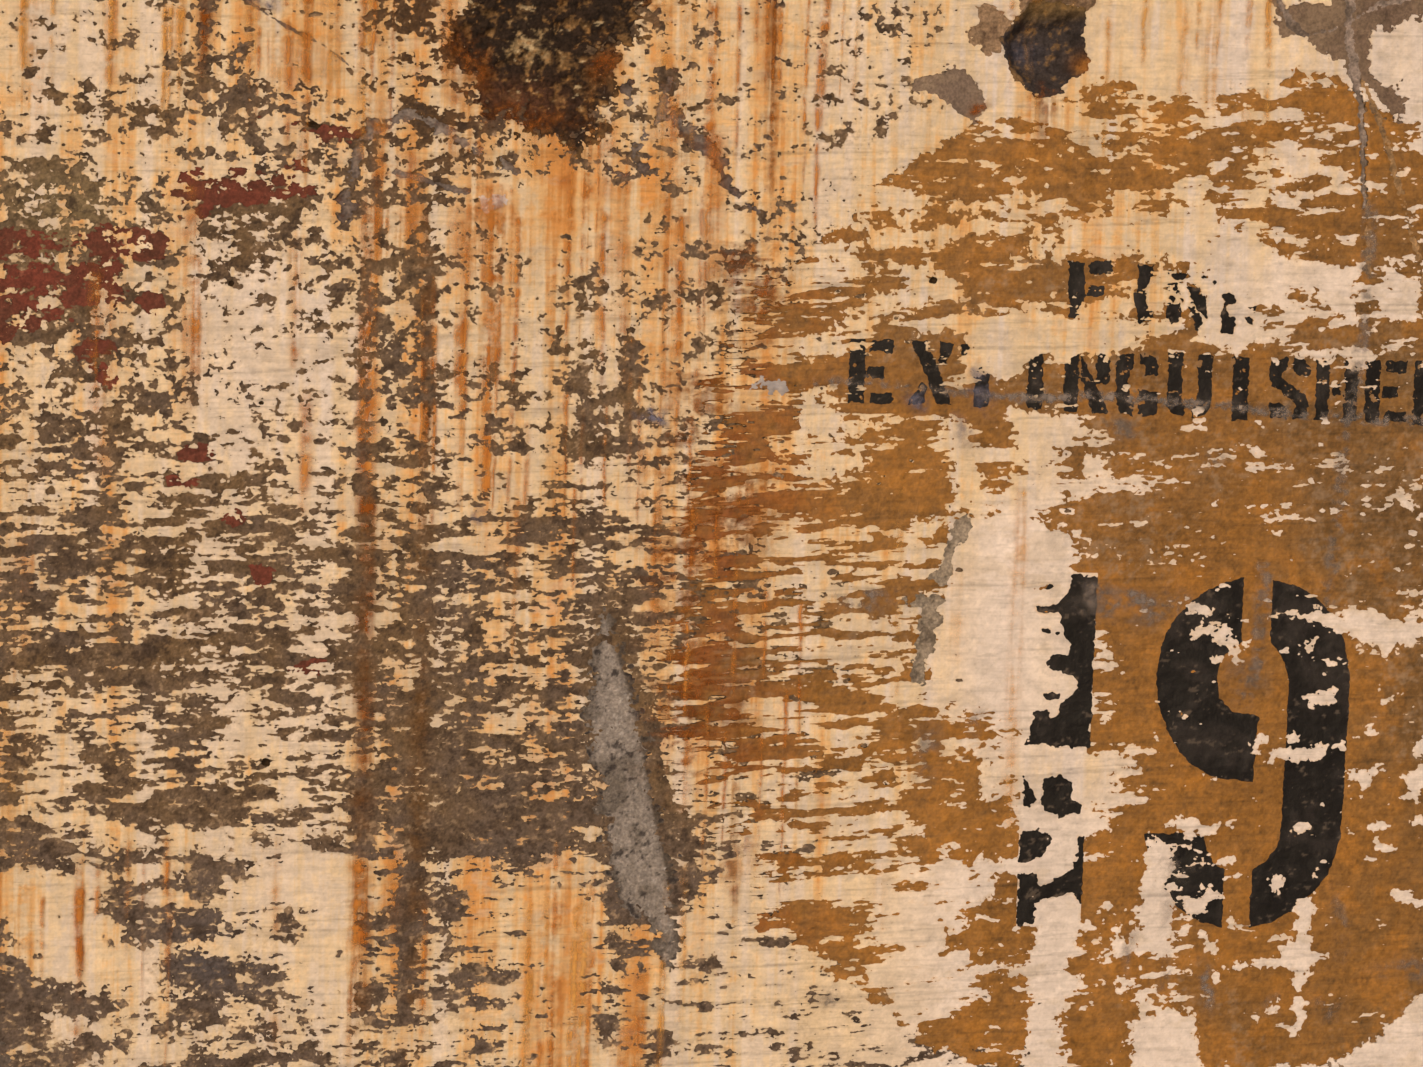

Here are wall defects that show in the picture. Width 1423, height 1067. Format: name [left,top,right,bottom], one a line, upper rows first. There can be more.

corrosion [286,33,336,88]
corrosion [738,1,783,84]
corrosion [803,0,830,198]
peeling [775,22,902,157]
peeling [1269,0,1423,155]
corrosion [455,189,520,412]
corrosion [481,436,528,552]
peeling [1245,443,1423,572]
peeling [1169,585,1423,709]
peeling [1248,684,1423,861]
corrosion [352,861,367,944]
peeling [1211,891,1330,1037]